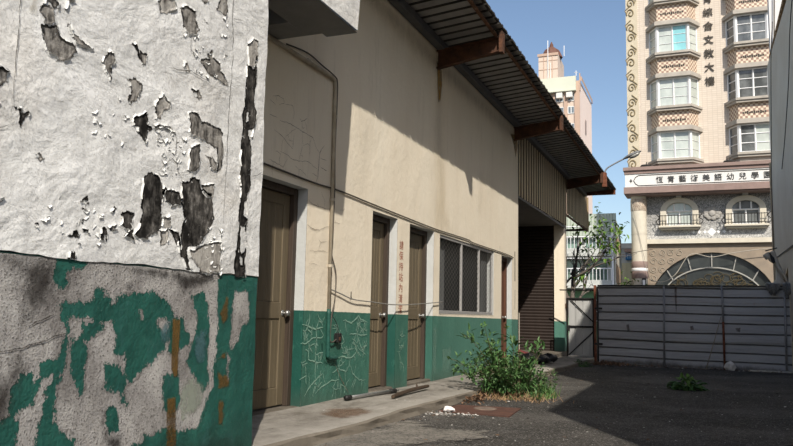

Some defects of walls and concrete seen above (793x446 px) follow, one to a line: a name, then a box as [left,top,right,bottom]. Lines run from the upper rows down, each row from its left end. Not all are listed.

peeling [0,63,11,86]
peeling [39,0,94,63]
peeling [101,47,116,81]
peeling [132,41,148,65]
peeling [158,0,229,86]
peeling [234,36,259,278]
crack [255,95,339,265]
peeling [0,77,250,446]
crack [301,315,367,398]